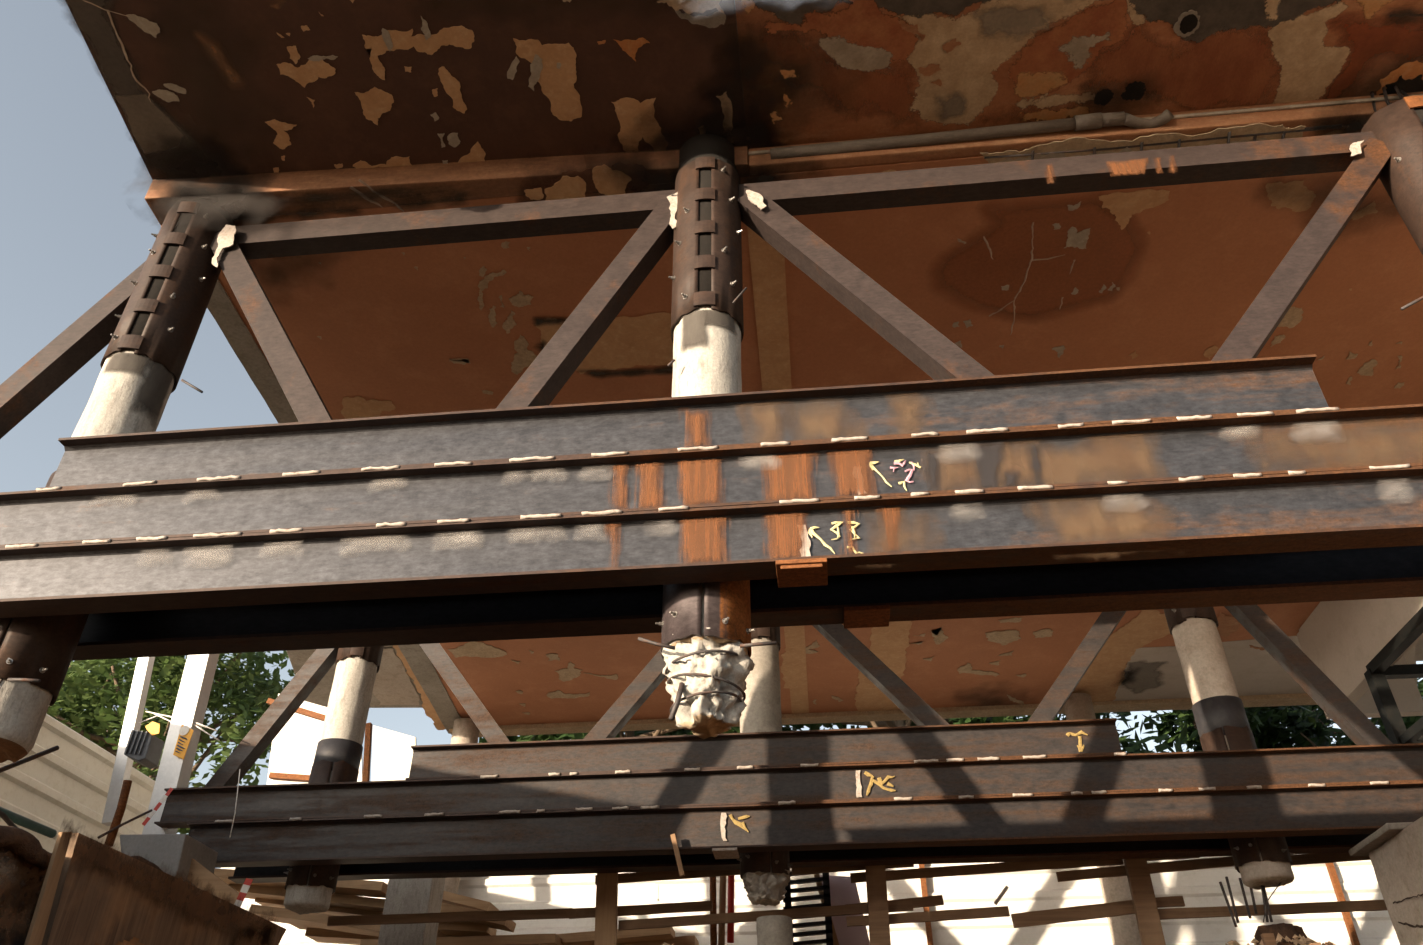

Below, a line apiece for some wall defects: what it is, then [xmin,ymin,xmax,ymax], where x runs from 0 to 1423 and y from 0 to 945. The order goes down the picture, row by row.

peeling [355,16,486,164]
peeling [507,38,582,122]
peeling [819,0,1111,126]
spalling [980,123,1318,163]
peeling [1126,0,1393,104]
crack [989,222,1075,335]
water stain [938,200,1139,317]
corrosion [605,410,726,567]
corrosion [753,407,812,558]
corrosion [800,407,917,552]
corrosion [936,435,1153,488]
crack [1393,894,1423,928]